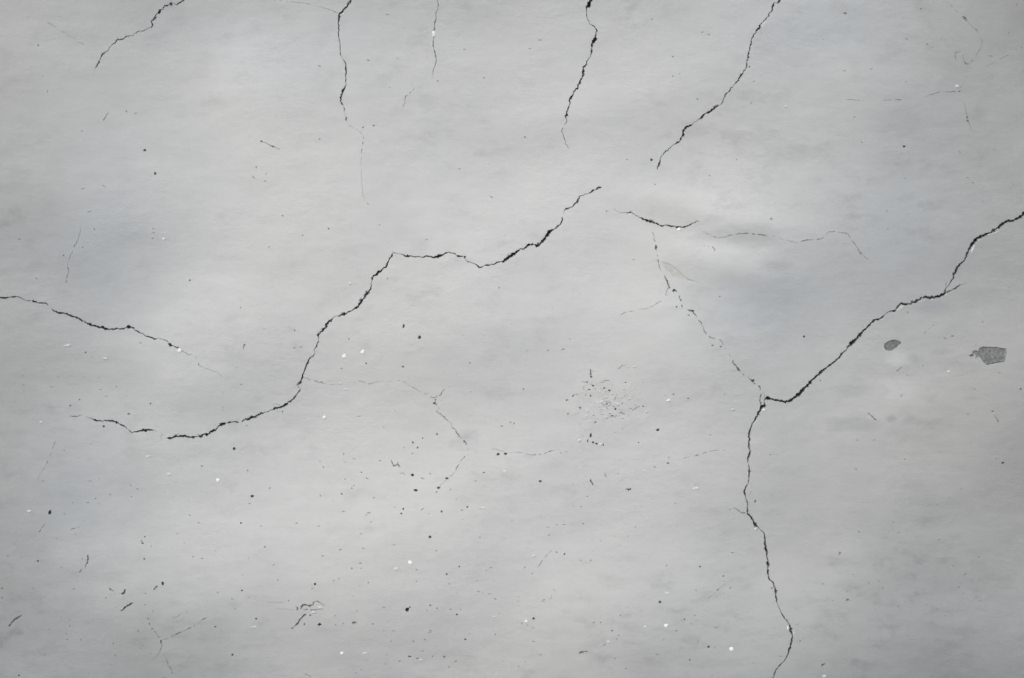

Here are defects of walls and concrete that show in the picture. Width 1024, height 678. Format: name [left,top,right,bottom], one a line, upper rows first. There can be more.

crack [82,0,184,82]
crack [275,0,375,205]
crack [561,0,598,146]
crack [650,0,781,169]
crack [0,296,226,379]
crack [72,187,602,489]
crack [618,211,1024,678]